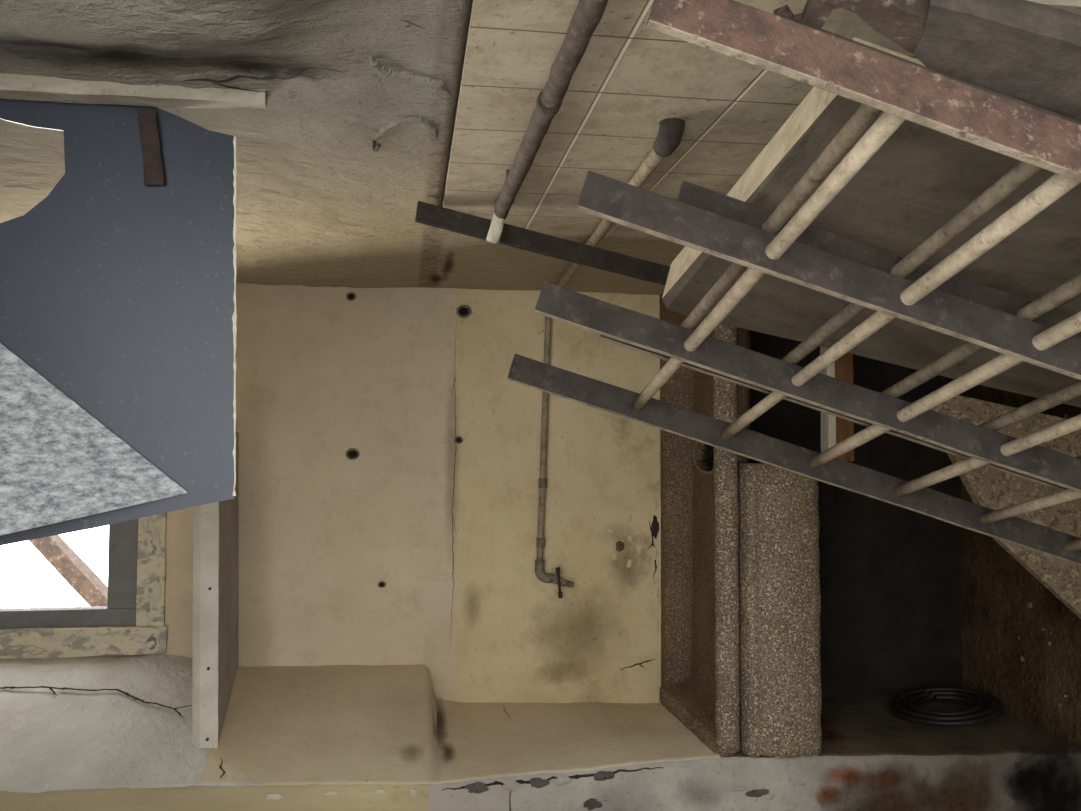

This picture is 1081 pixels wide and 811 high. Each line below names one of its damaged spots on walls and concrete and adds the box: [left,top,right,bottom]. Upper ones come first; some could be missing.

crack [0,686,192,717]
leakage [844,770,988,811]
leakage [1009,748,1081,811]